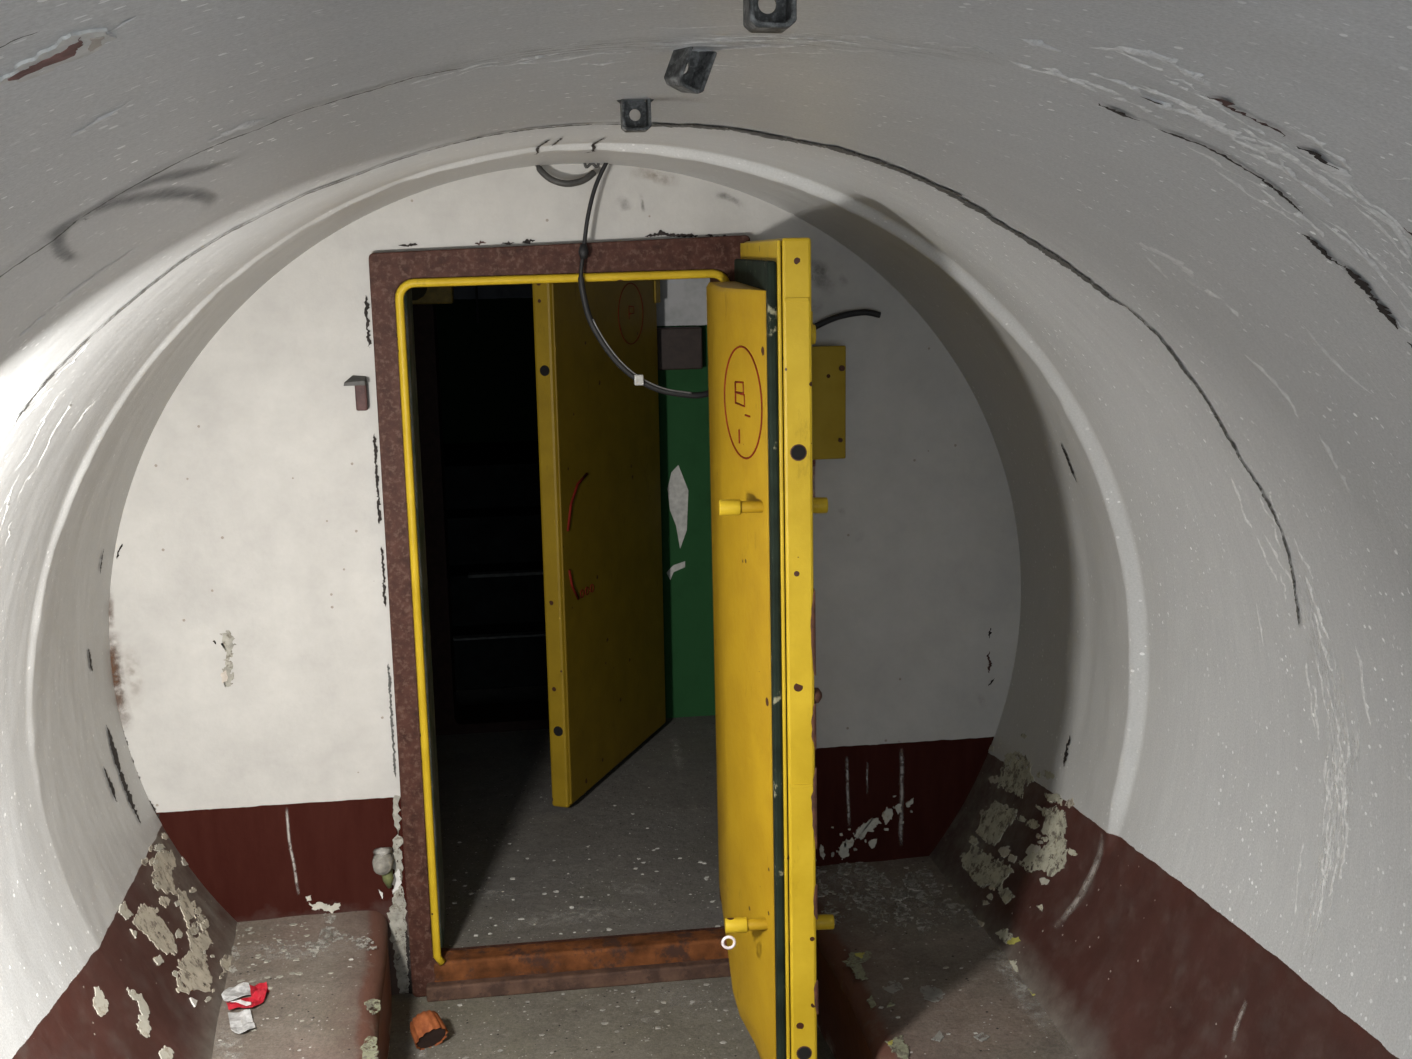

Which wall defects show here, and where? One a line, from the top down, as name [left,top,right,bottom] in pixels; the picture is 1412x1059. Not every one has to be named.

spalling [0,28,117,84]
crack [0,68,461,277]
crack [1099,97,1412,348]
peeling [118,832,240,1007]
peeling [842,951,903,1009]
peeling [885,1035,909,1059]
peeling [816,733,1077,972]